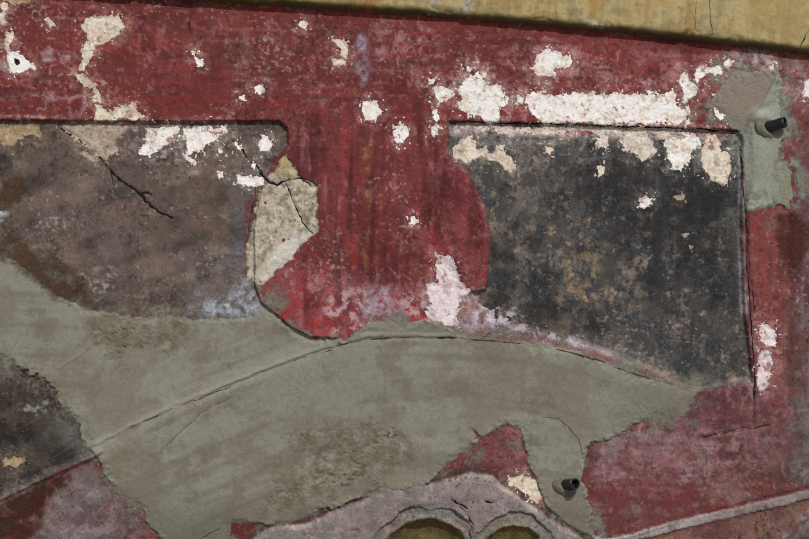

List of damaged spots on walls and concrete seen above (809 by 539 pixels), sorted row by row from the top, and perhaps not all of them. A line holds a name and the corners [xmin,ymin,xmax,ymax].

crack [59,127,174,219]
spalling [0,0,321,285]
crack [232,140,314,234]
peeling [421,45,737,192]
crack [453,120,740,132]
peeling [424,251,471,334]
crack [438,336,520,344]
crack [558,349,670,384]
crack [703,156,766,438]
peeling [749,316,781,402]